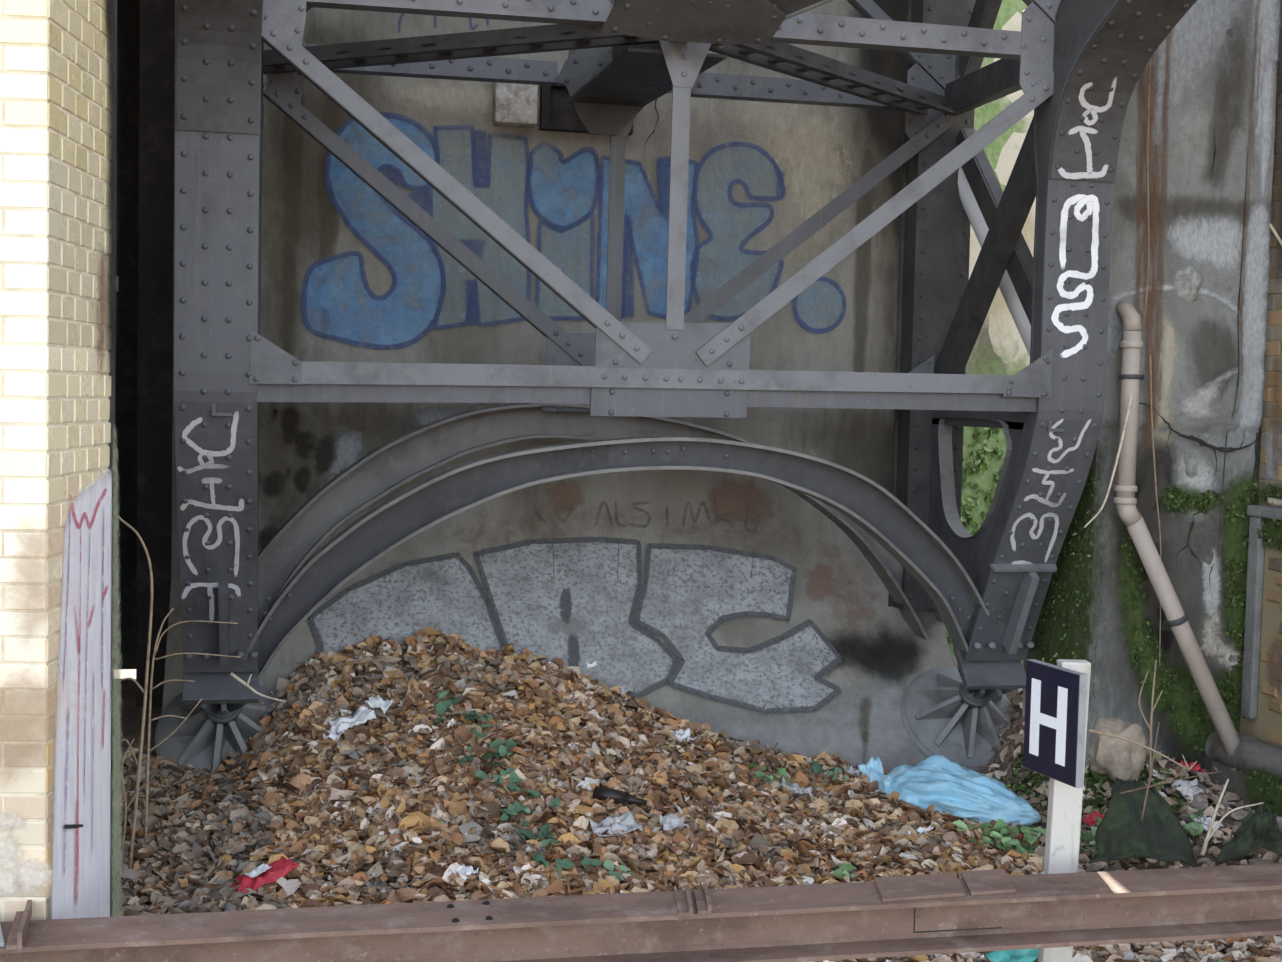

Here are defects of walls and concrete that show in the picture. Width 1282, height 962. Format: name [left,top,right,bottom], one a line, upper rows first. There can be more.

corrosion [1136,33,1170,446]
water stain [1112,0,1282,436]
water stain [264,411,459,534]
water stain [1123,523,1149,583]
water stain [1135,318,1174,511]
water stain [1144,607,1172,653]
water stain [1138,668,1205,769]
crack [1139,130,1268,597]